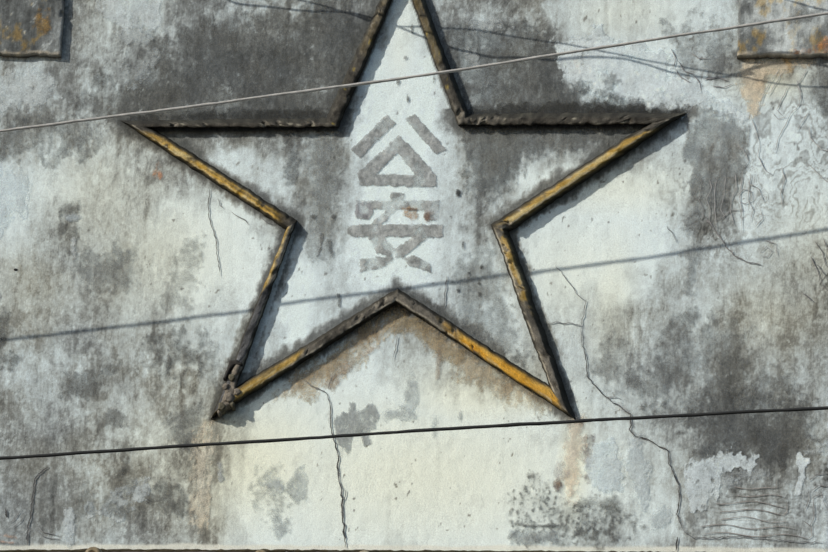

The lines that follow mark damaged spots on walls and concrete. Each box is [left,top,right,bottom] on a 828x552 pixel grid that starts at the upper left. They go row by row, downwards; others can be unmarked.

crack [208,189,223,270]
crack [705,217,761,265]
water stain [148,326,210,379]
water stain [146,422,213,527]
crack [304,375,346,544]
water stain [508,417,630,549]
crack [553,267,819,550]
peeling [700,469,814,539]